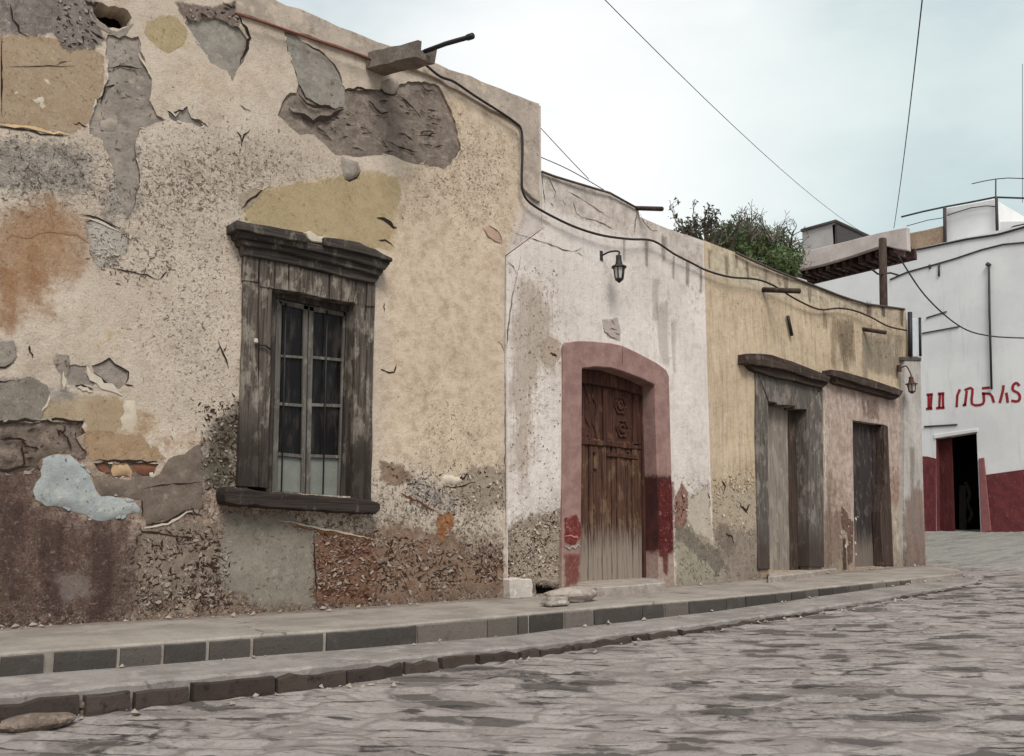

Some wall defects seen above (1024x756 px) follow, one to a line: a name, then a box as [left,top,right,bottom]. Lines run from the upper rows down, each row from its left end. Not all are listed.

peeling [0,0,251,219]
flaking render [278,33,462,169]
flaking render [0,340,165,521]
flaking render [304,267,581,607]